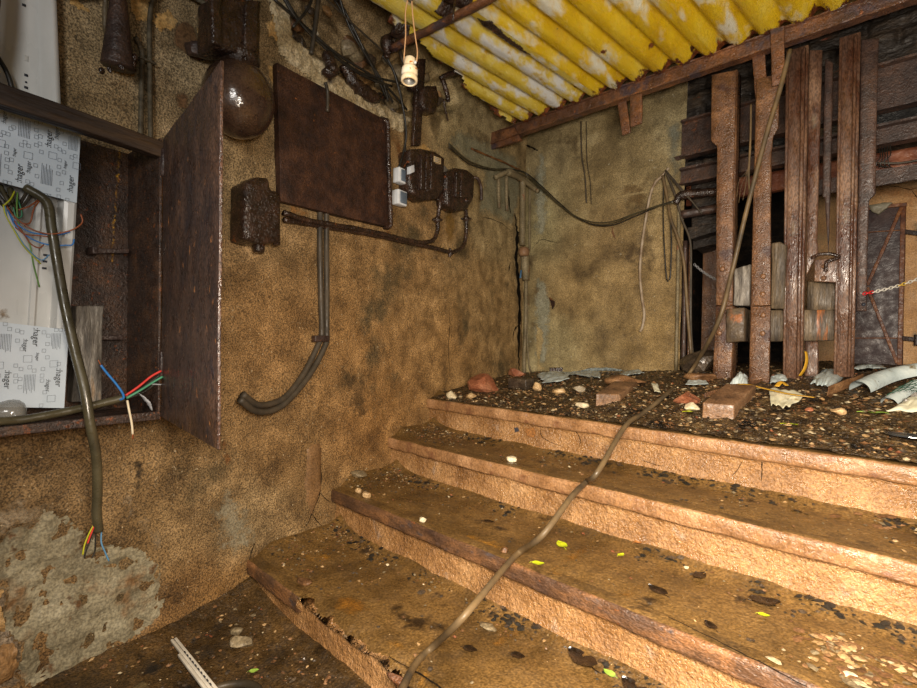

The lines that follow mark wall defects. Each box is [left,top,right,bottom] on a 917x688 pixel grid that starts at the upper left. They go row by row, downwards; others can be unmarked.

crack [480,196,556,370]
spalling [0,509,165,687]